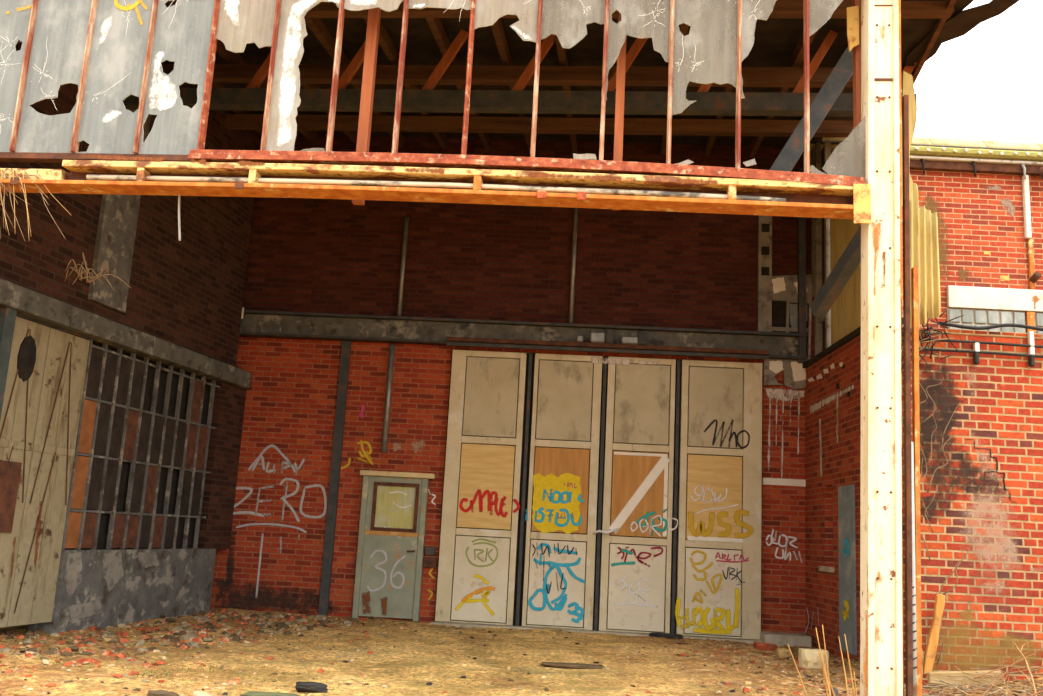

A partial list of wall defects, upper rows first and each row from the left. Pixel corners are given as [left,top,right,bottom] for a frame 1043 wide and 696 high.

corrosion [529,173,635,181]
corrosion [872,222,886,295]